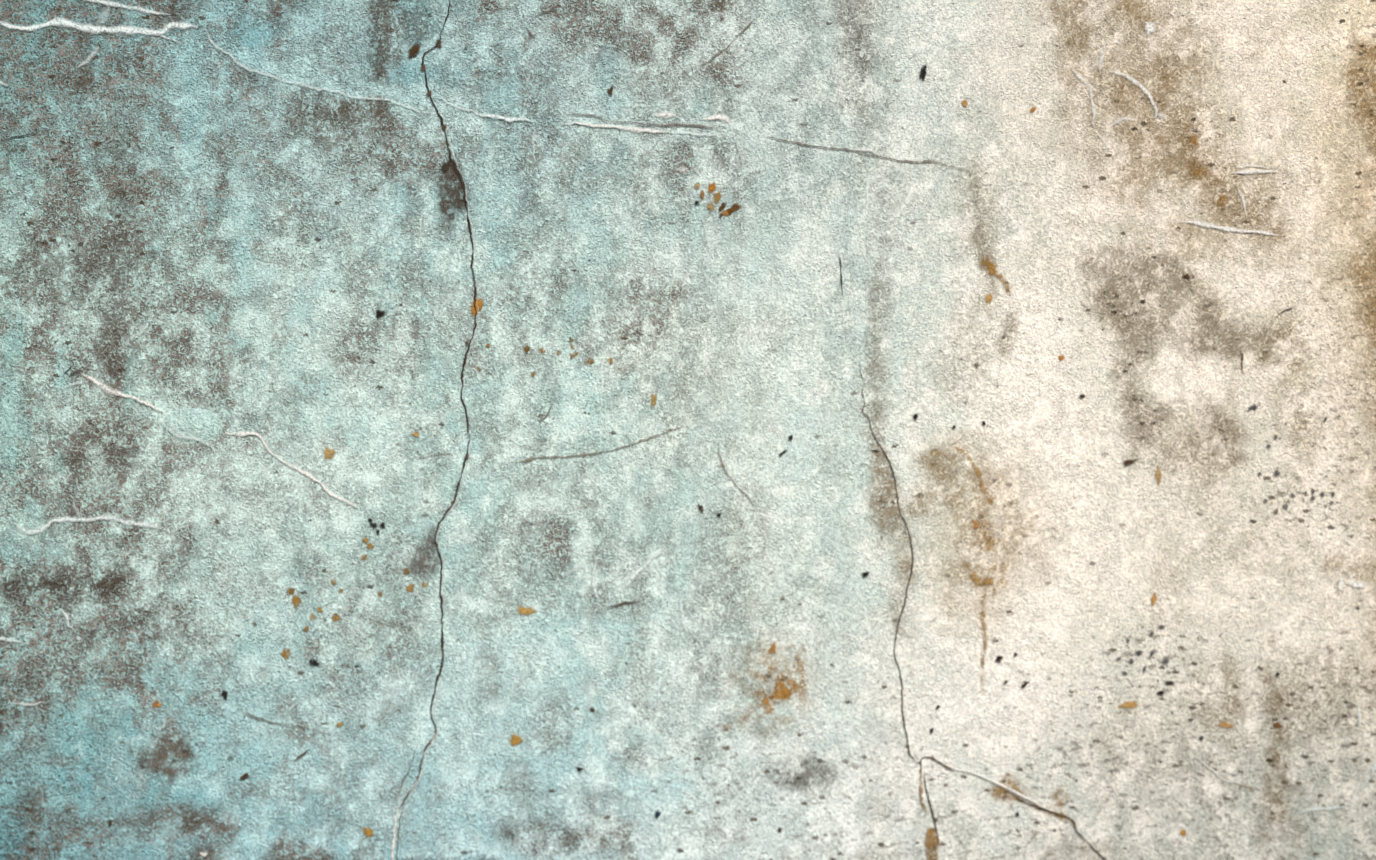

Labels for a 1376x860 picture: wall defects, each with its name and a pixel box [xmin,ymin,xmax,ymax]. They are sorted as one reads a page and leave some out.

crack [698,20,754,67]
damp [1348,44,1376,147]
rust [694,183,740,218]
crack [768,136,968,171]
damp [1355,240,1376,338]
crack [0,0,742,860]
crack [718,449,750,499]
crack [860,364,1106,860]
rust [966,520,1004,681]
rust [754,642,805,713]